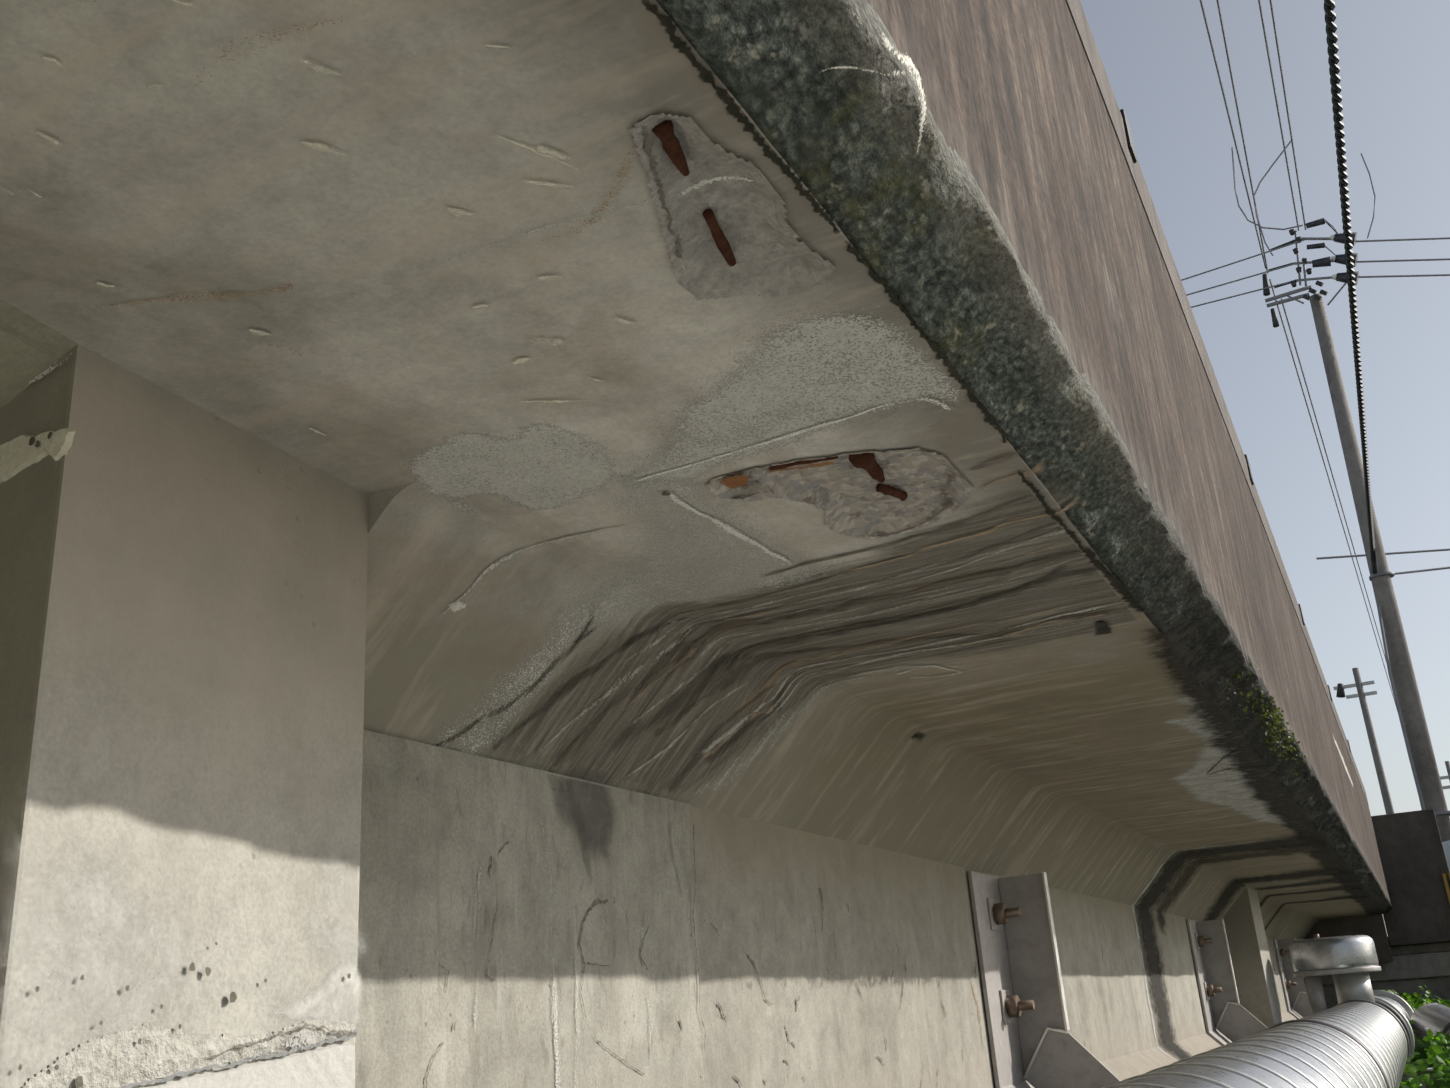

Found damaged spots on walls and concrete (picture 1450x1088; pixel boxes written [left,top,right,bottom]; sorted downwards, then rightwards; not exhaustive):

damp [822,33,927,153]
spalling [628,113,836,300]
crack [642,0,1144,613]
peeling [0,428,76,483]
damp [398,304,1136,853]
spalling [703,447,974,541]
damp [1132,608,1390,1060]
crack [425,964,456,1088]
damp [536,794,581,1088]
crack [579,898,649,1074]